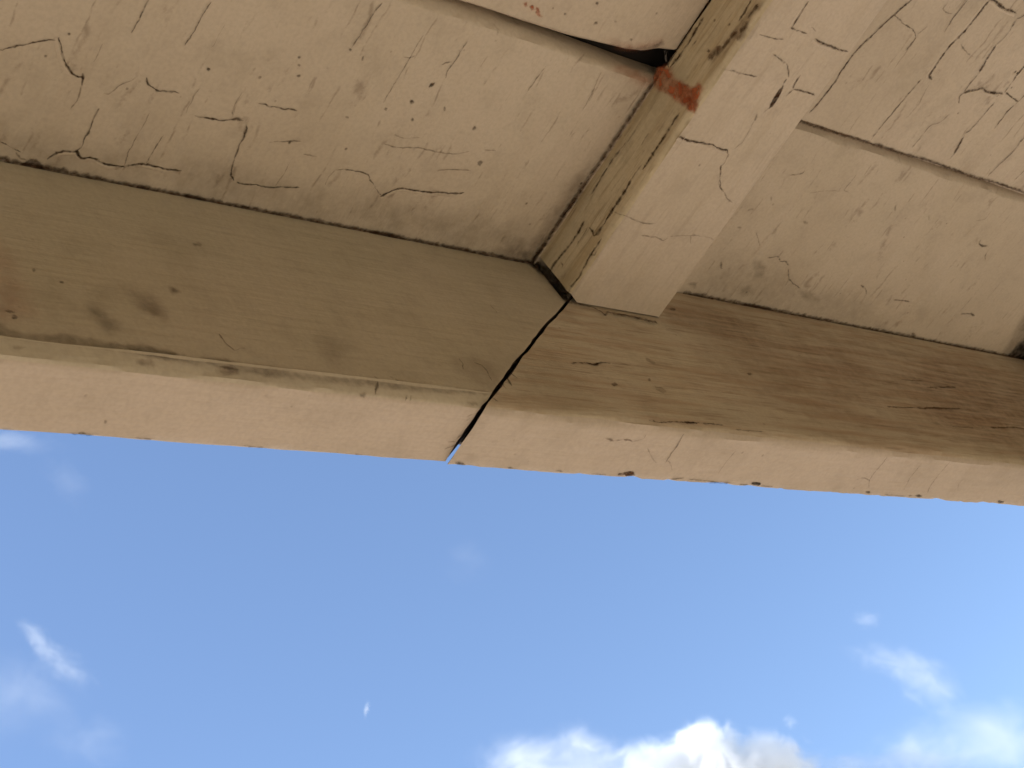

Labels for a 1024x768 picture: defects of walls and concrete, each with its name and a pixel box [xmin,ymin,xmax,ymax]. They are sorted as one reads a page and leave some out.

crack [3,38,84,83]
rust [653,67,700,112]
crack [762,0,916,111]
crack [879,0,1023,129]
crack [955,46,1024,152]
crack [50,109,181,174]
crack [204,117,297,188]
crack [347,169,464,199]
crack [550,115,728,287]